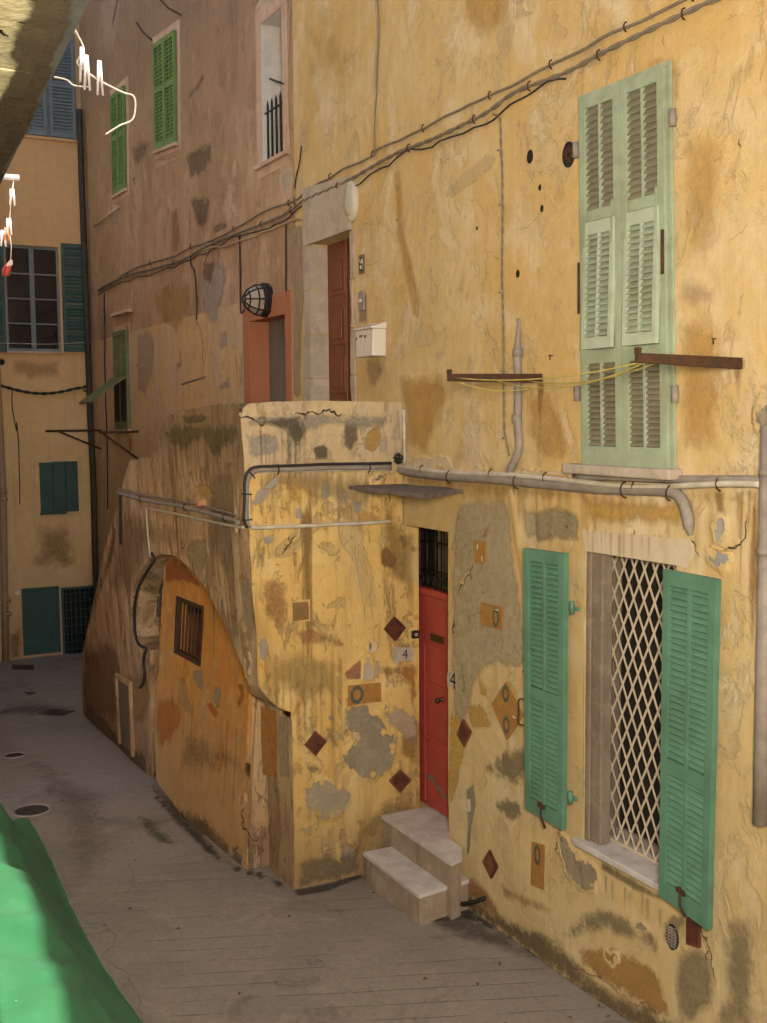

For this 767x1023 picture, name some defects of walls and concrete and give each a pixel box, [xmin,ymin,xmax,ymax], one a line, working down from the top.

damp [0,0,71,180]
crack [297,405,347,419]
peeling [525,508,578,541]
flaking render [704,511,735,577]
peeling [448,500,524,854]
flaking render [300,703,416,824]
damp [573,913,656,949]